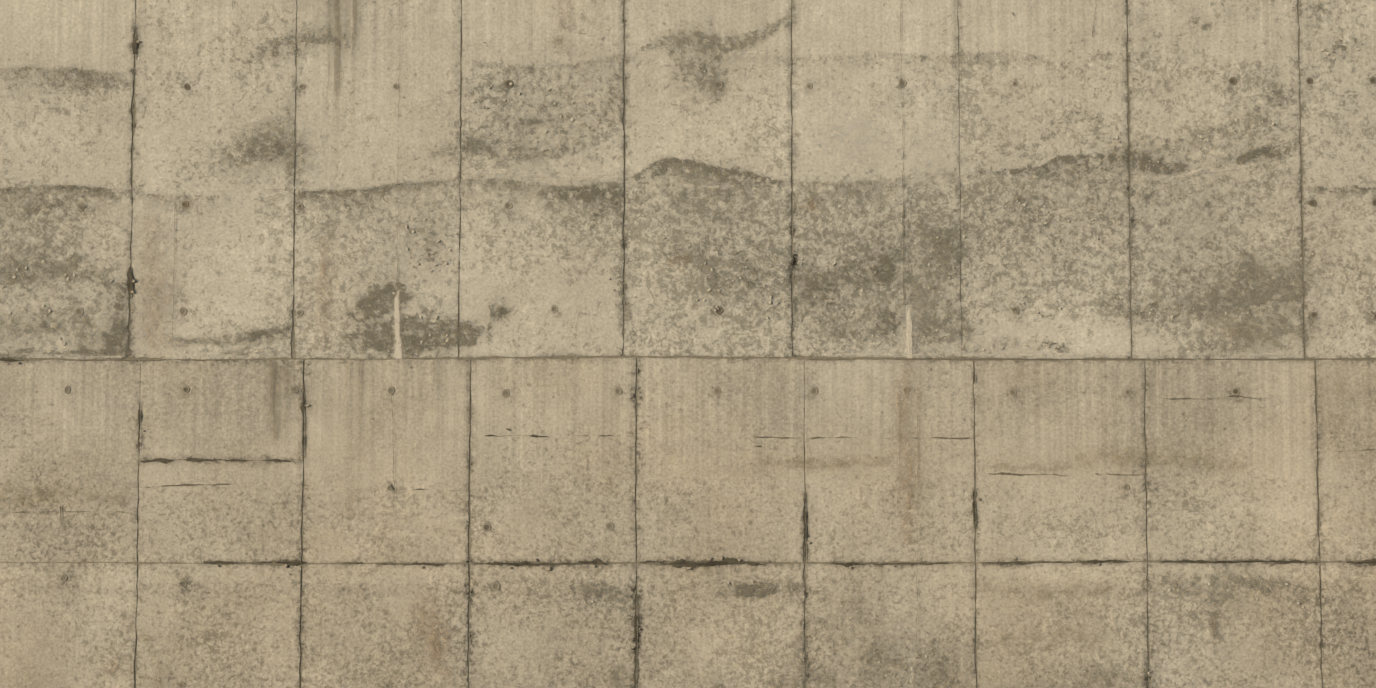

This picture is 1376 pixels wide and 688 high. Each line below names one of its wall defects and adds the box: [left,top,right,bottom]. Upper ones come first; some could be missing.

leakage [218,107,447,218]
leakage [345,281,511,359]